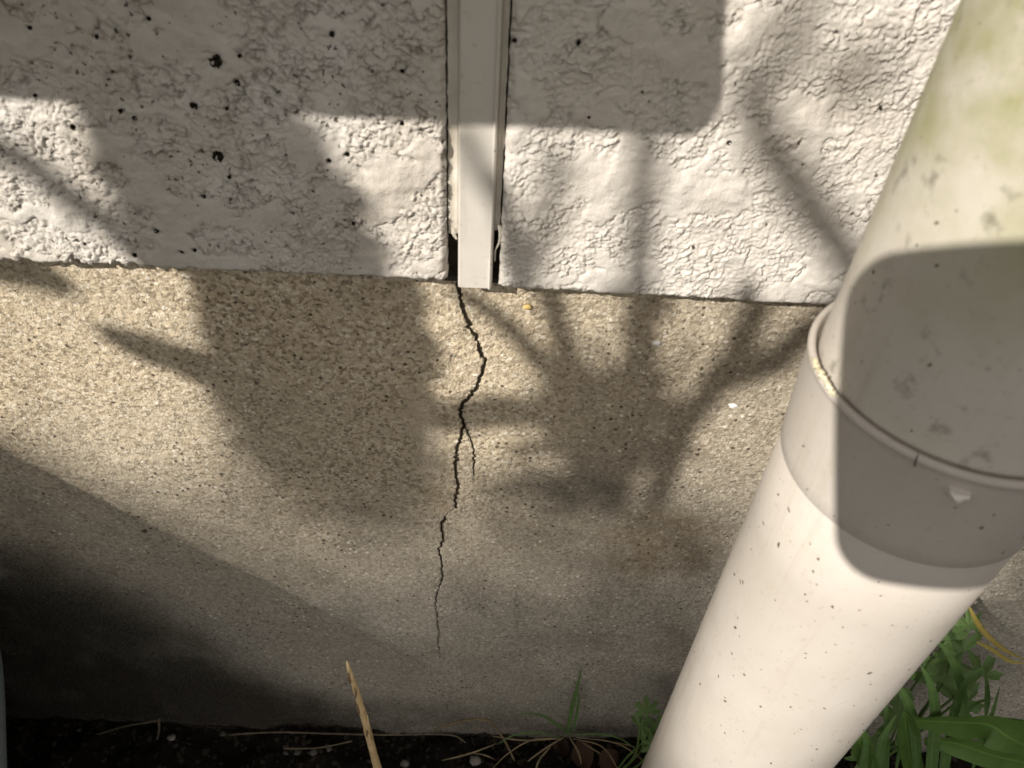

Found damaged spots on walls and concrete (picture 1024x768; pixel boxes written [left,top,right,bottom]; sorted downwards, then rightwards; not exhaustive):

crack [434,283,487,654]